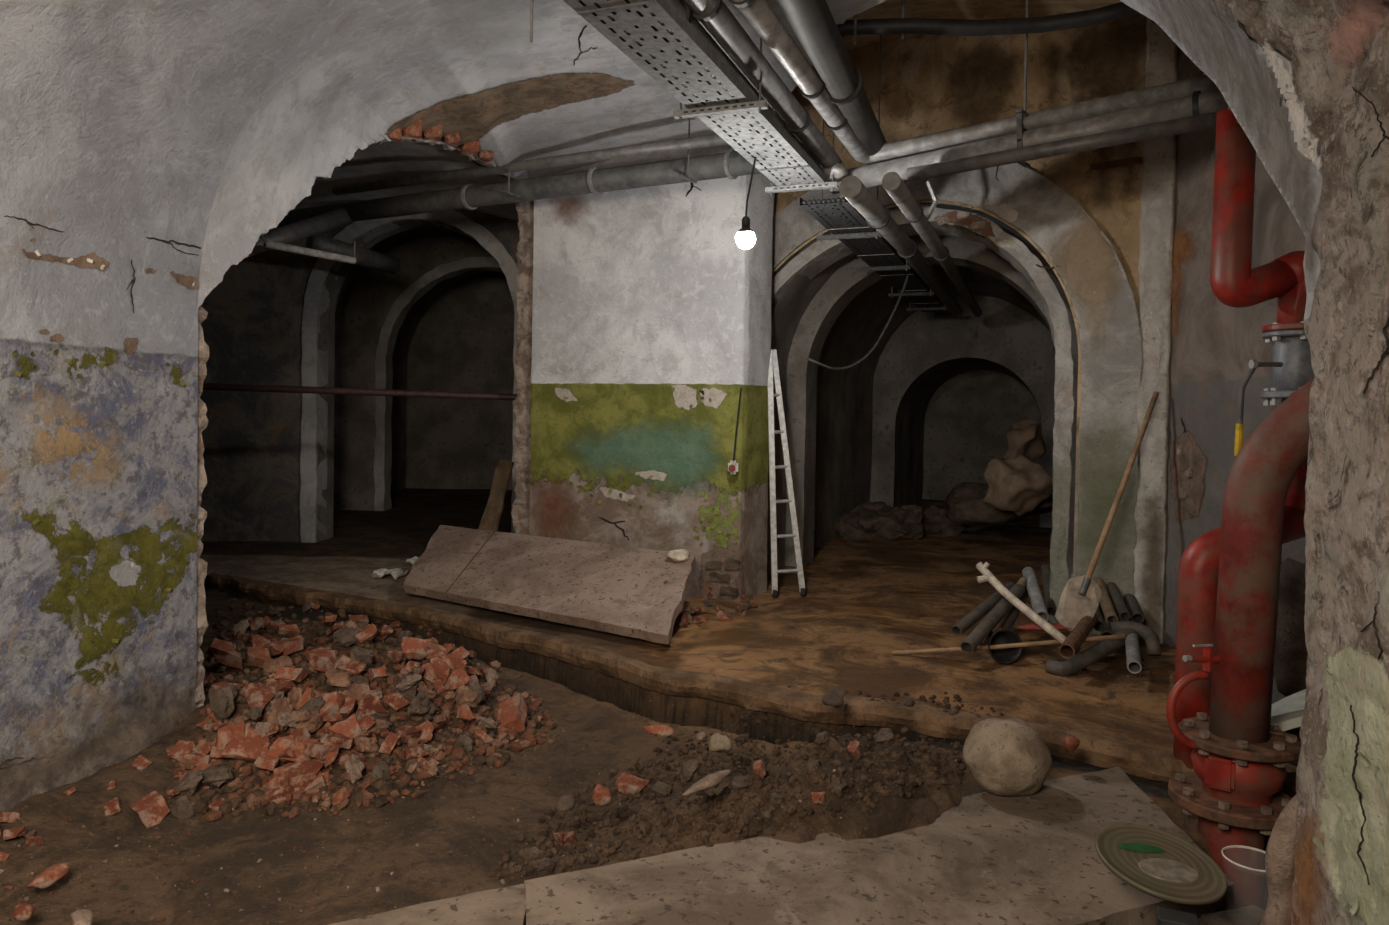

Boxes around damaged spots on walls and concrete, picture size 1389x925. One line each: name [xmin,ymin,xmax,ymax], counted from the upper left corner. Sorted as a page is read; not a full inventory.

flaking render [388,120,494,162]
crack [4,215,64,232]
spalling [22,239,110,271]
crack [127,237,201,313]
spalling [145,268,199,290]
corrosion [1171,230,1194,332]
peeling [555,388,577,402]
peeling [671,384,727,411]
peeling [1312,644,1389,925]